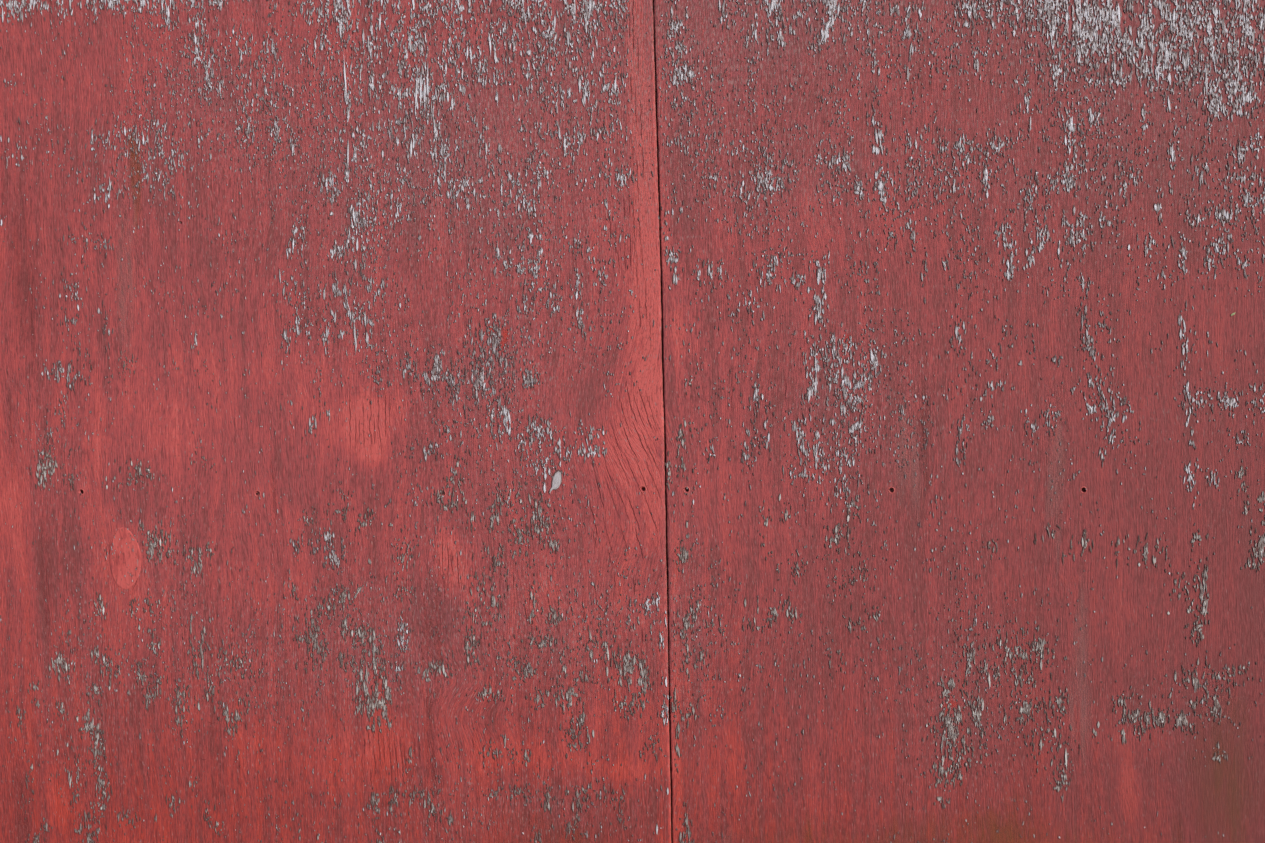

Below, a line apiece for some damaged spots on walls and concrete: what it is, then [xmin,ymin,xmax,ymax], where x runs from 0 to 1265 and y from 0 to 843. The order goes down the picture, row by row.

peeling [662,0,1265,468]
peeling [16,591,268,843]
peeling [371,785,454,843]
peeling [484,783,627,843]
peeling [684,239,1063,639]
peeling [914,604,1080,809]
peeling [1034,522,1094,562]
peeling [1113,529,1261,744]
peeling [1174,300,1265,574]